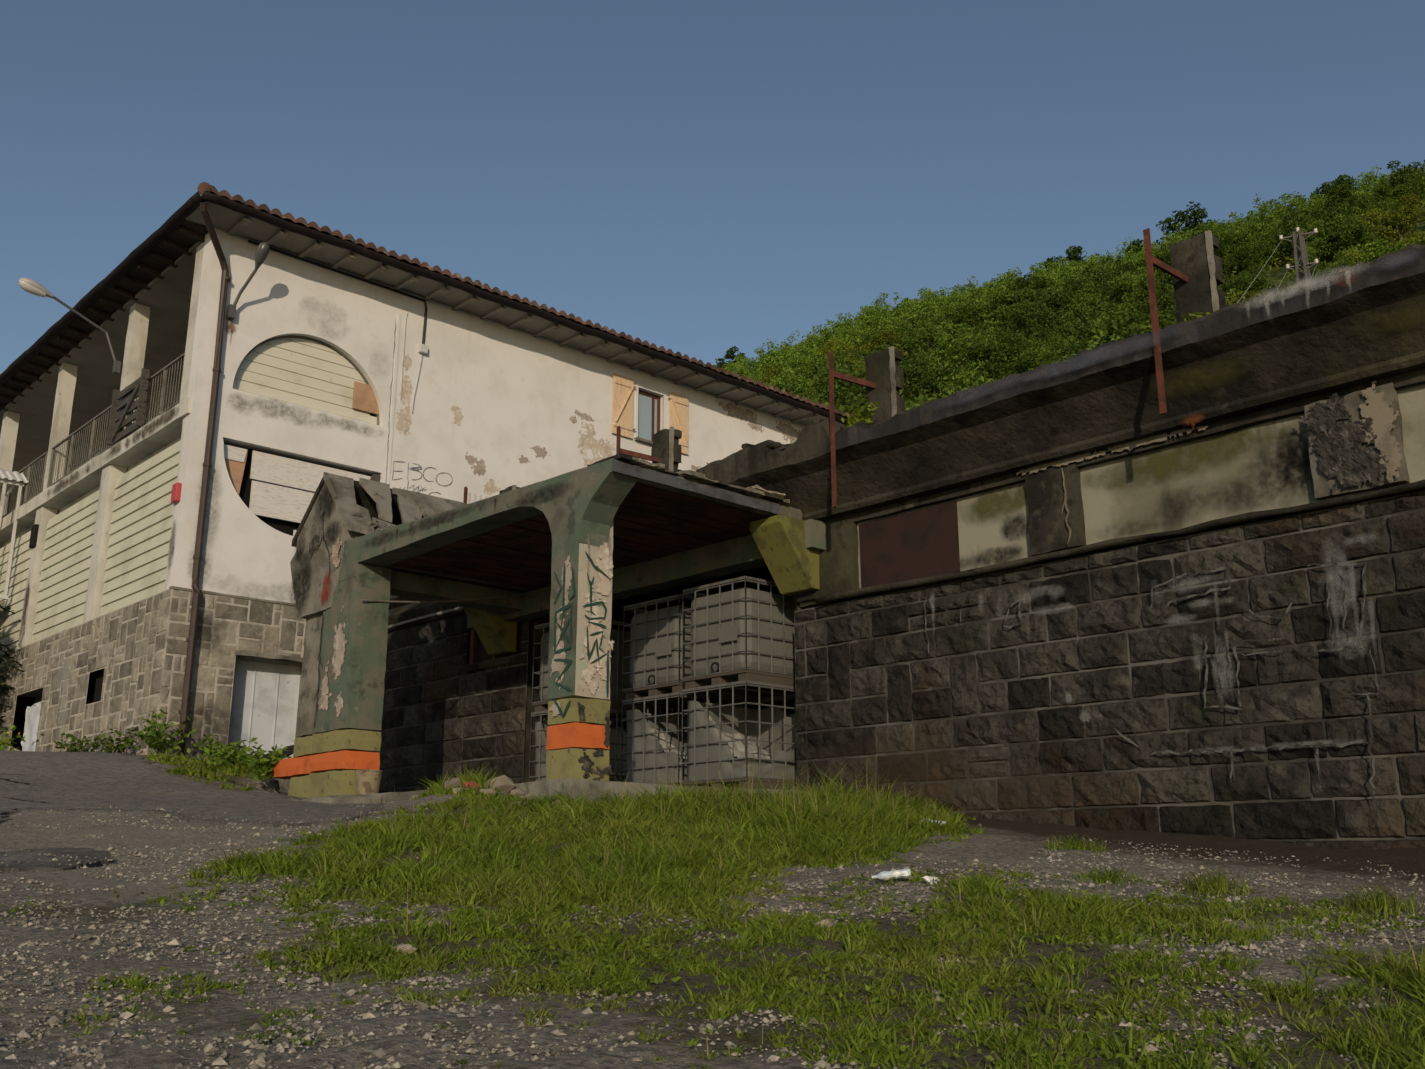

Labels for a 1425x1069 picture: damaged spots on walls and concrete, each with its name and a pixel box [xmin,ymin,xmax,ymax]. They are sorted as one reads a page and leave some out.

peeling [465,452,500,495]
peeling [519,446,551,463]
peeling [569,409,616,467]
peeling [318,606,348,717]